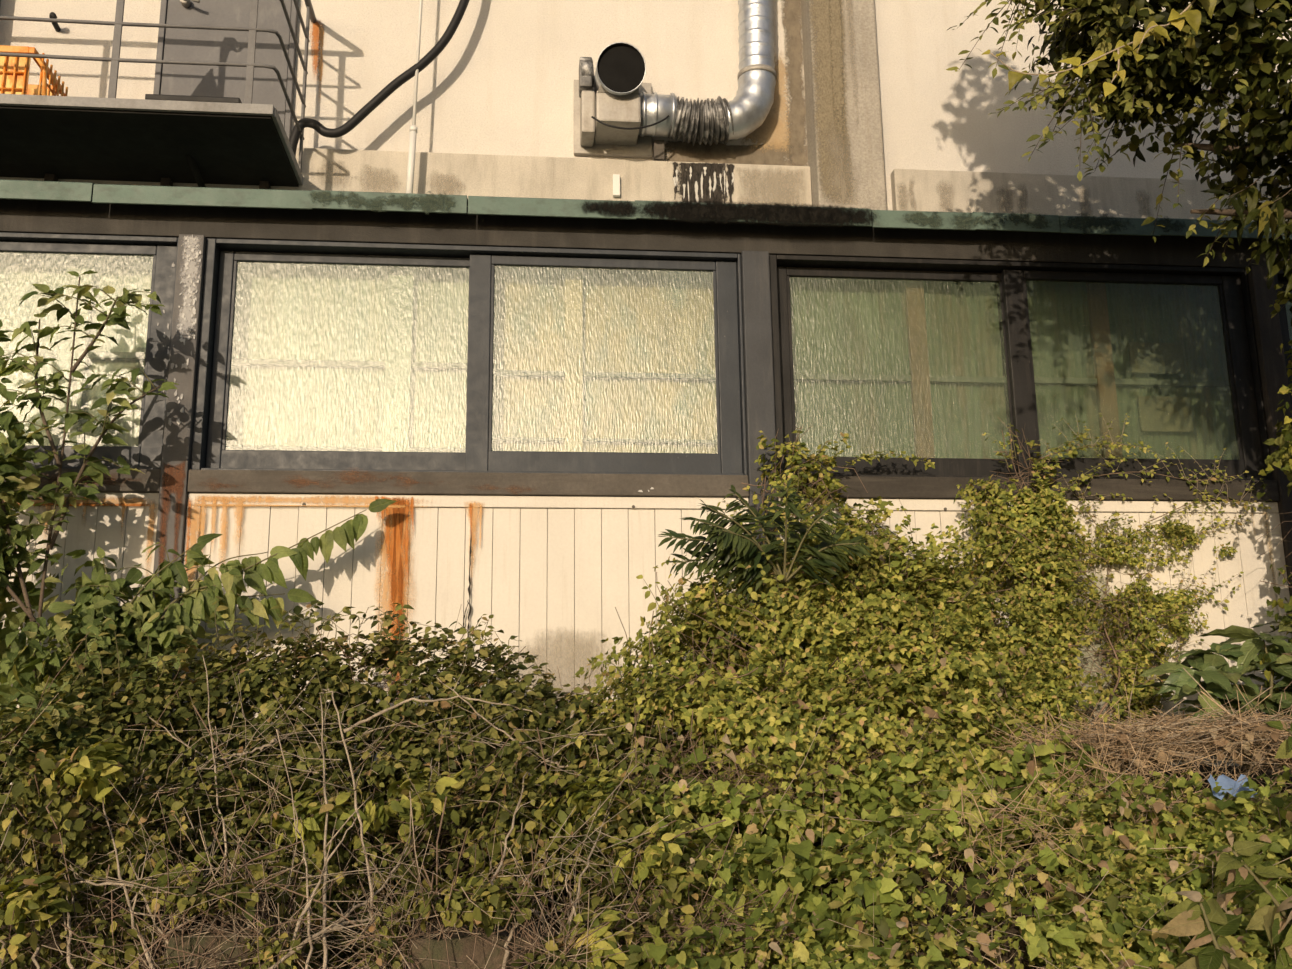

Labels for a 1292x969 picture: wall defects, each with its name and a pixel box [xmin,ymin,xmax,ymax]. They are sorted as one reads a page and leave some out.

corrosion [312,21,324,81]
damp [582,0,874,226]
peeling [157,235,201,426]
corrosion [18,461,423,692]
corrosion [468,502,482,556]